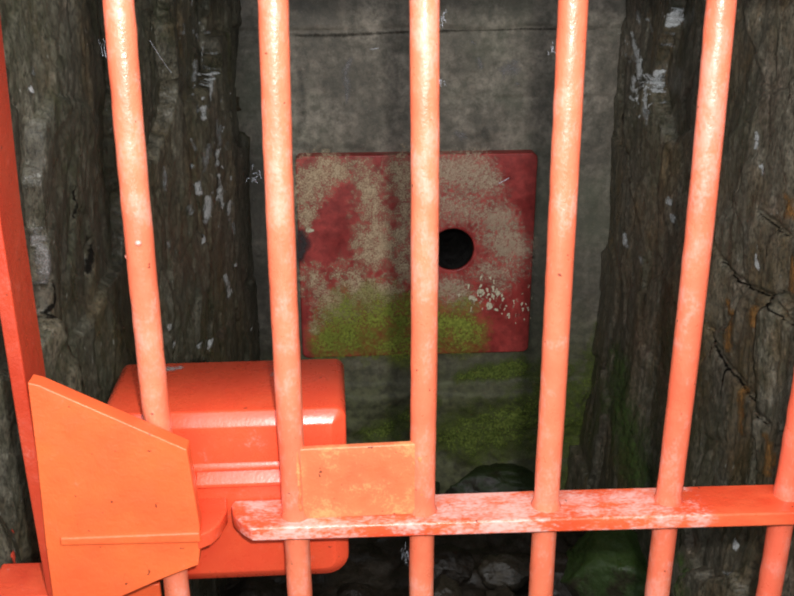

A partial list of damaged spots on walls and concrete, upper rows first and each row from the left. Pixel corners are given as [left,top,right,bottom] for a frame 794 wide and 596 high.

peeling [438,152,532,324]